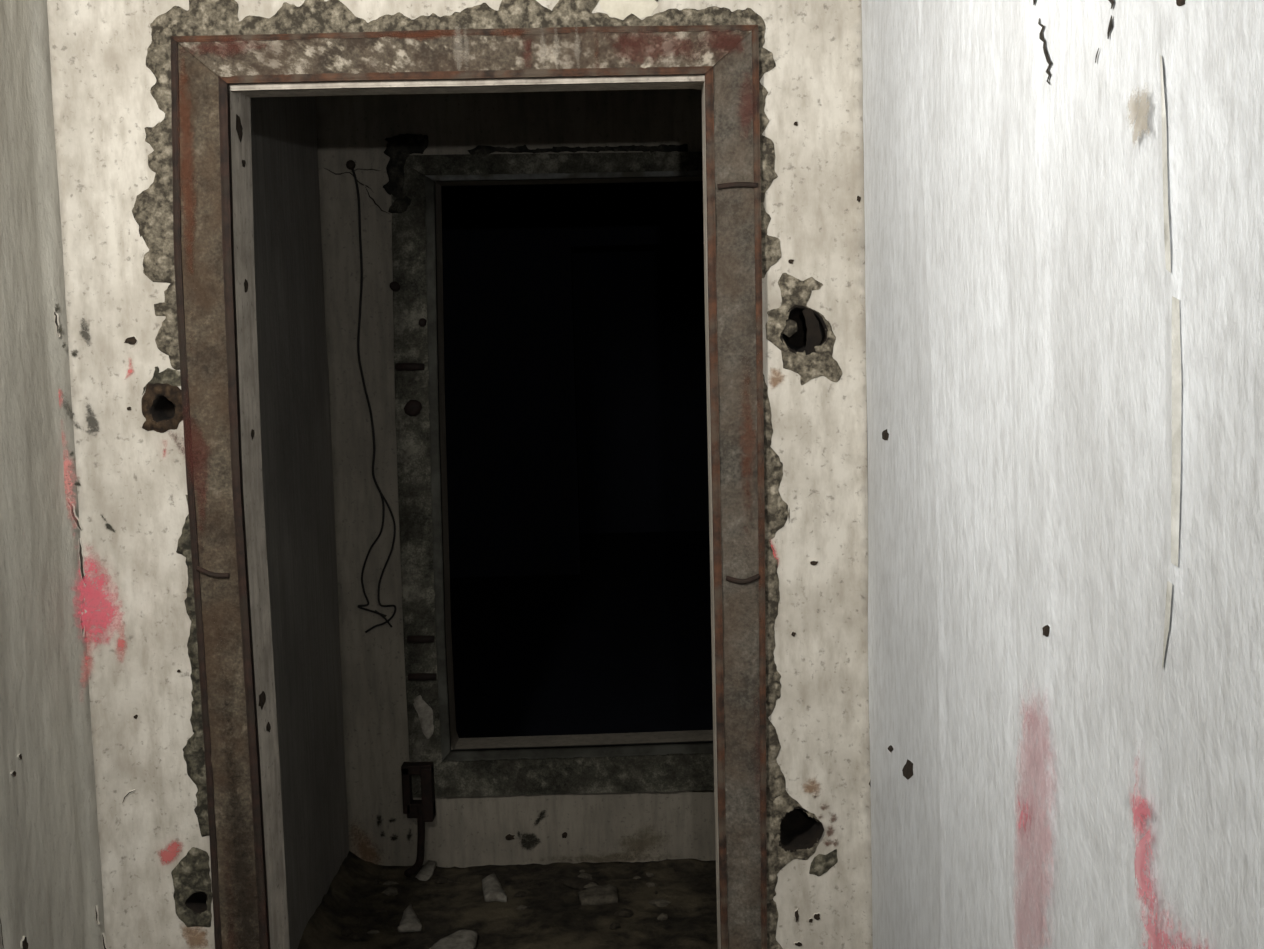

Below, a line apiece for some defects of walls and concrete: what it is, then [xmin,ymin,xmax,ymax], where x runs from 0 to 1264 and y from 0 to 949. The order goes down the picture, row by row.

spalling [127,0,842,433]
corrosion [164,421,206,513]
spalling [171,495,212,927]
spalling [259,691,271,733]
spalling [763,374,838,949]